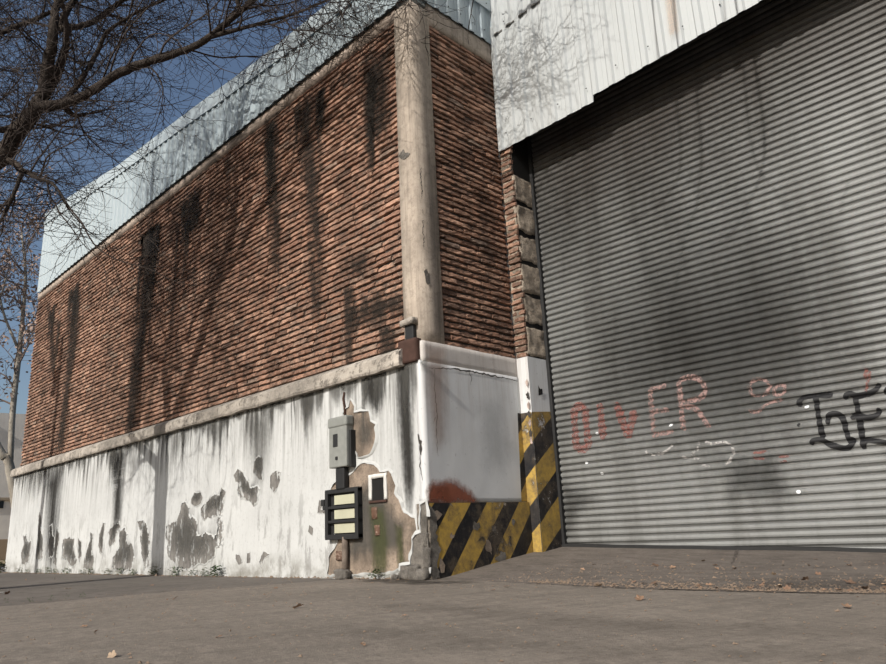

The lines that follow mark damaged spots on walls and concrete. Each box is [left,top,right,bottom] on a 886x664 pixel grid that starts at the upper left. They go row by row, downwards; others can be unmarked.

leakage [174,189,200,291]
leakage [264,113,279,276]
leakage [294,87,324,315]
peeling [21,511,151,574]
leakage [16,224,386,564]
peeling [165,455,281,573]
leakage [343,286,404,365]
flaking render [327,398,445,580]
leakage [397,360,427,497]
rust [429,481,476,503]